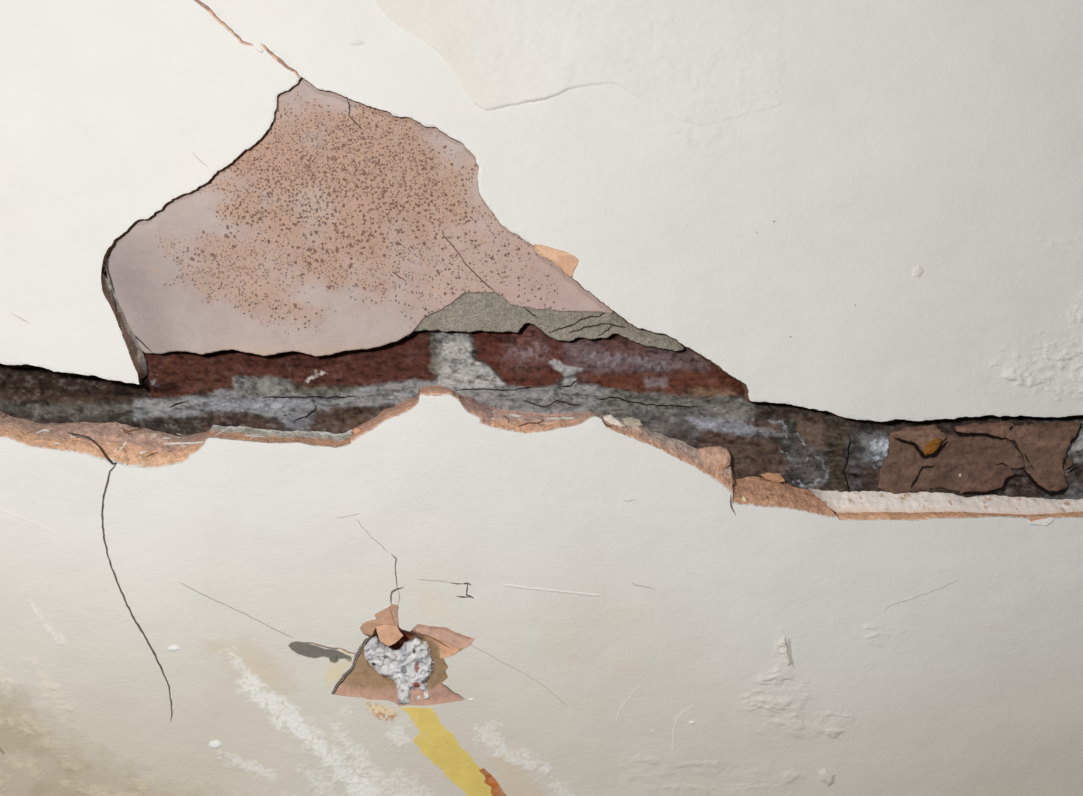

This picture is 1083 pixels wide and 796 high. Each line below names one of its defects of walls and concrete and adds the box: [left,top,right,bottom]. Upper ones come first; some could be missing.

flaking render [101,77,750,401]
flaking render [332,608,474,708]
corrosion [478,768,499,796]
crack [0,323,1083,722]